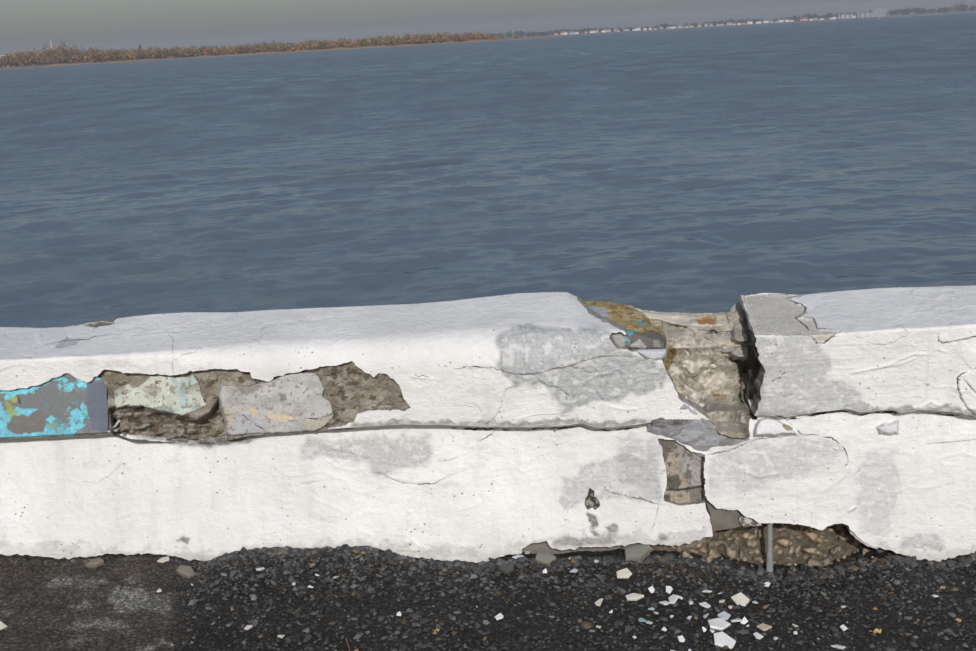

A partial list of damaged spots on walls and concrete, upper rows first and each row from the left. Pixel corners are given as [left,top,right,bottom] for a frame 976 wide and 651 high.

spalling [578,296,626,333]
spalling [0,361,411,444]
crack [456,405,647,441]
leakage [497,326,667,407]
spalling [585,488,600,510]
spalling [650,417,712,526]
spalling [609,292,838,440]
crack [702,410,900,501]
crack [928,368,976,444]